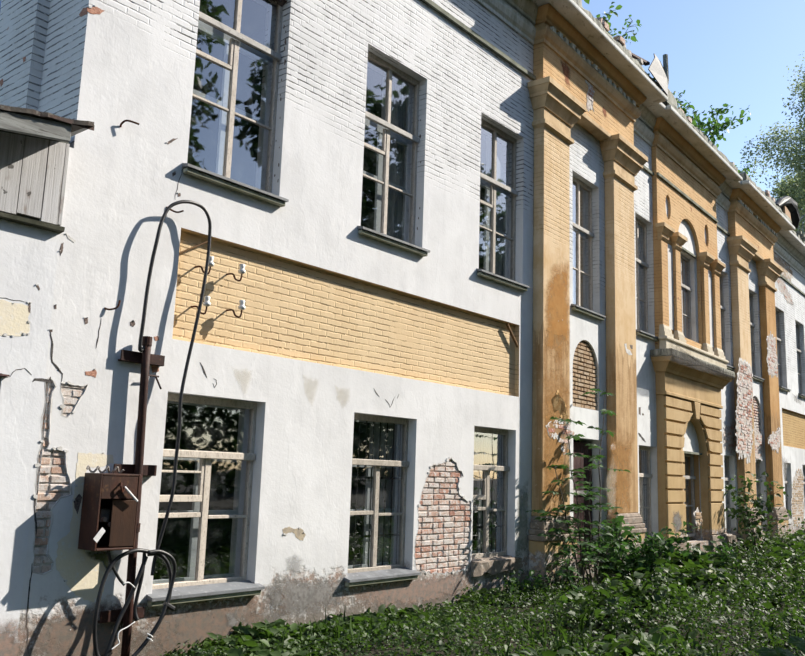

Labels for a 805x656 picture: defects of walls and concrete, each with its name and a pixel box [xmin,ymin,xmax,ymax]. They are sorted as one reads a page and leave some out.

crack [1,332,63,382]
damp [546,267,569,357]
flaking render [766,331,778,378]
damp [544,376,569,502]
flaking render [722,358,781,464]
crack [32,491,40,534]
flaking render [32,368,114,603]
flaking render [414,457,472,575]
flaking render [791,466,804,529]
crack [25,567,33,654]
damp [36,599,259,656]
damp [364,574,467,606]